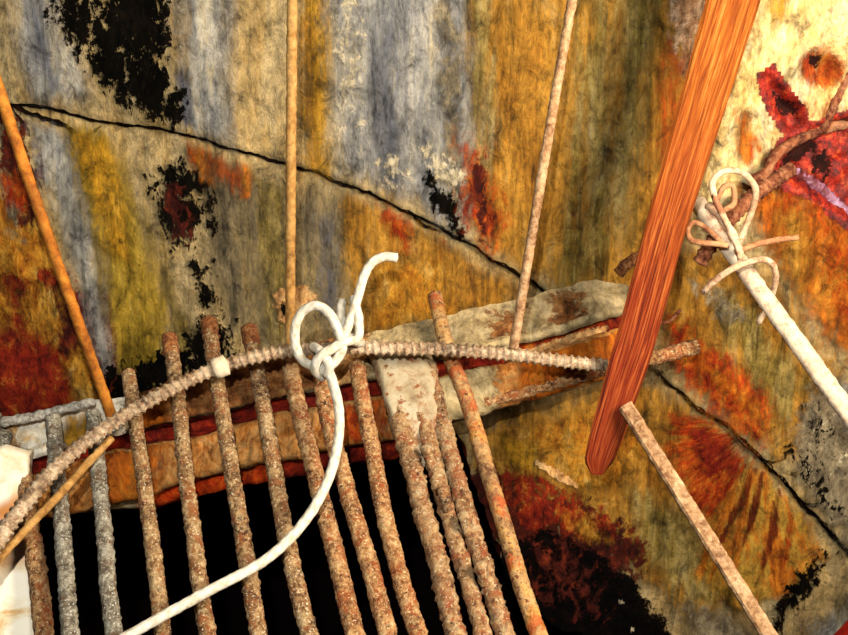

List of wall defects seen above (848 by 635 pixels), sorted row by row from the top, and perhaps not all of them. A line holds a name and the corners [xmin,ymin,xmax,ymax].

corrosion [0,106,99,416]
water stain [19,0,233,140]
water stain [142,147,349,375]
crack [10,103,545,292]
spalling [272,284,317,323]
spalling [0,291,609,635]
water stain [325,0,477,239]
corrosion [459,0,706,288]
corrosion [459,356,743,615]
spalling [648,339,701,367]
corrosion [635,249,825,604]
crack [659,373,848,556]